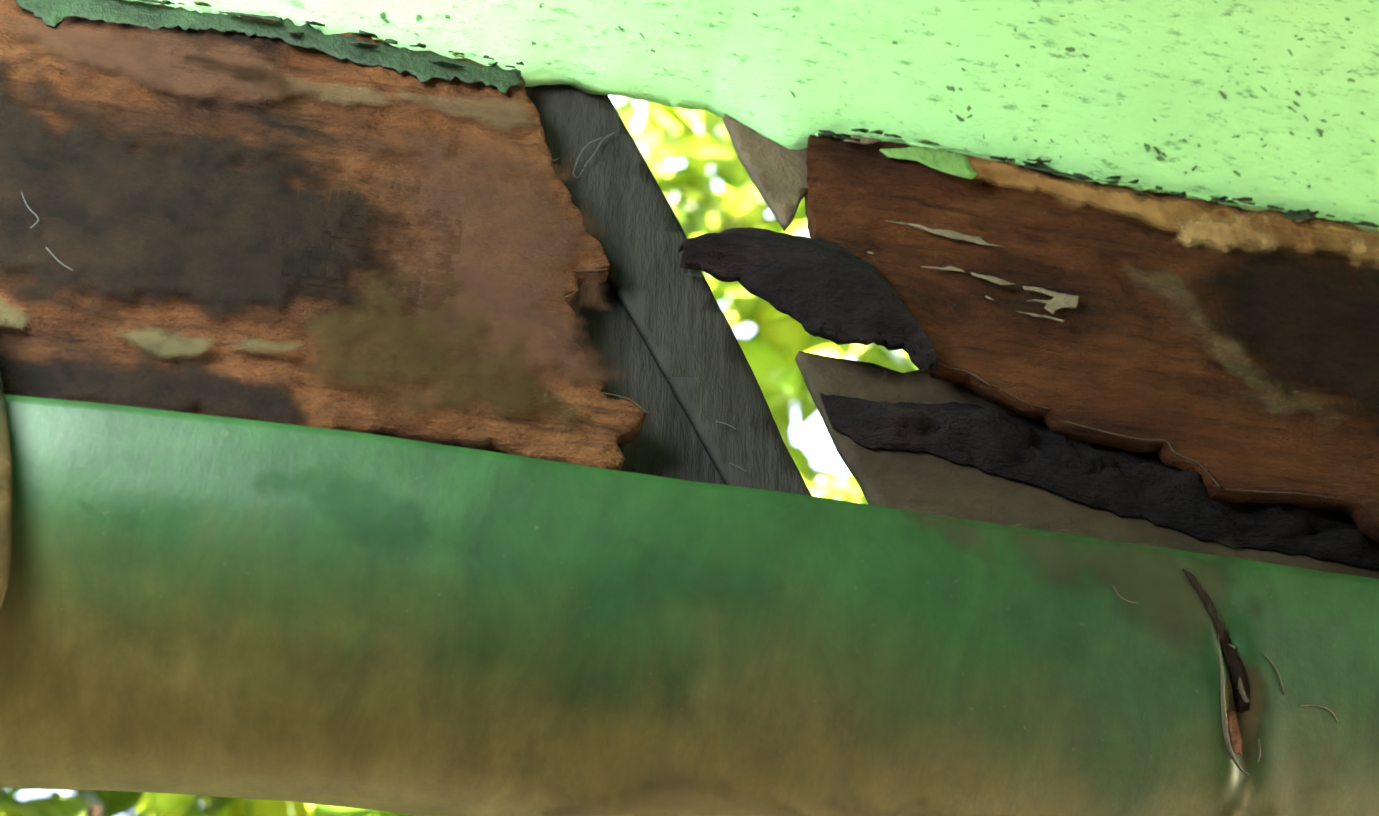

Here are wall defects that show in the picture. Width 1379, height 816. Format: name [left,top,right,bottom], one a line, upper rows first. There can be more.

peeling [15,0,524,93]
spalling [1287,8,1361,82]
spalling [946,86,973,122]
spalling [1219,58,1343,139]
peeling [815,128,1379,229]
peeling [885,220,1004,247]
peeling [921,265,1079,323]
crack [1183,568,1338,775]